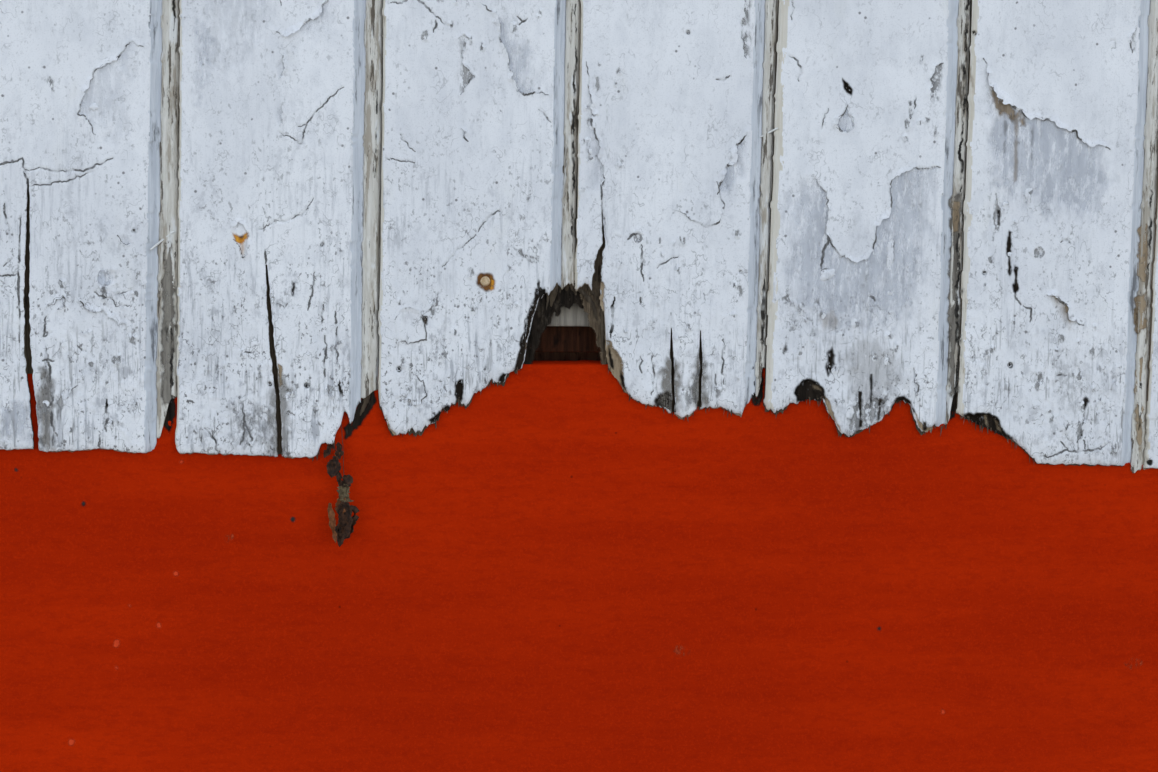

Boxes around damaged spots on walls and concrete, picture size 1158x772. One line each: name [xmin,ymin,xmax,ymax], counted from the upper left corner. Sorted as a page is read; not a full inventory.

water stain [992,90,1024,125]
peeling [820,165,941,269]
crack [0,157,113,448]
crack [201,198,314,455]
rust [477,273,495,291]